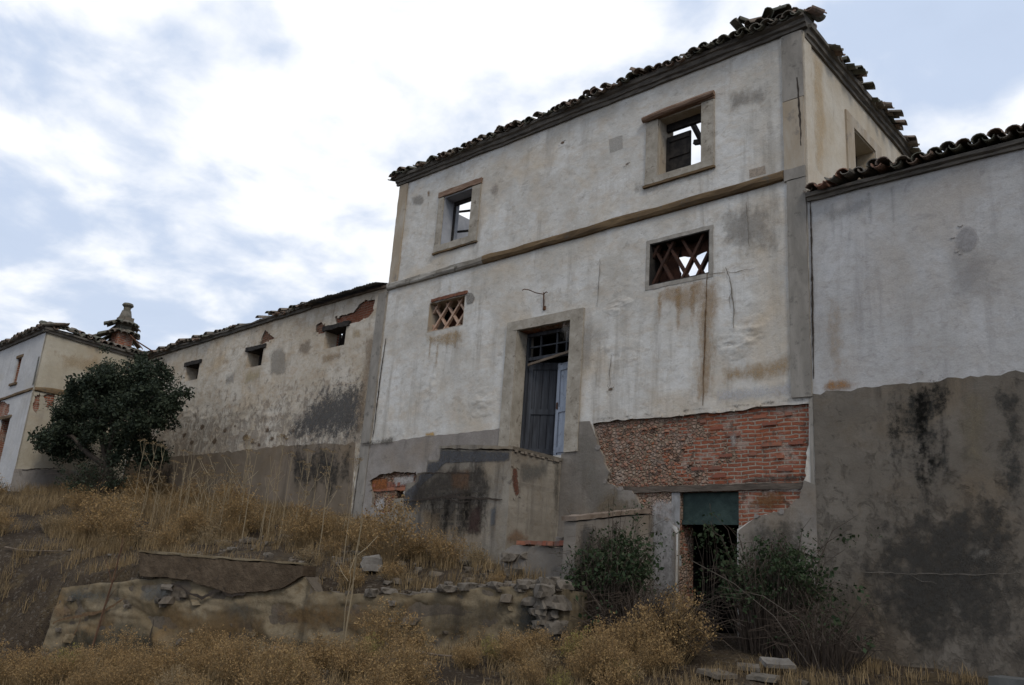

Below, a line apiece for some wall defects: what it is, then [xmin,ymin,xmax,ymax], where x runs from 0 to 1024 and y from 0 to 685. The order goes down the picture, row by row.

crack [795,77,803,146]
spalling [337,297,374,323]
crack [702,205,754,406]
leakage [287,378,393,496]
spalling [368,470,416,510]
leakage [413,466,495,533]
spalling [653,501,673,591]
spalling [595,407,741,491]
leakage [865,385,1021,652]